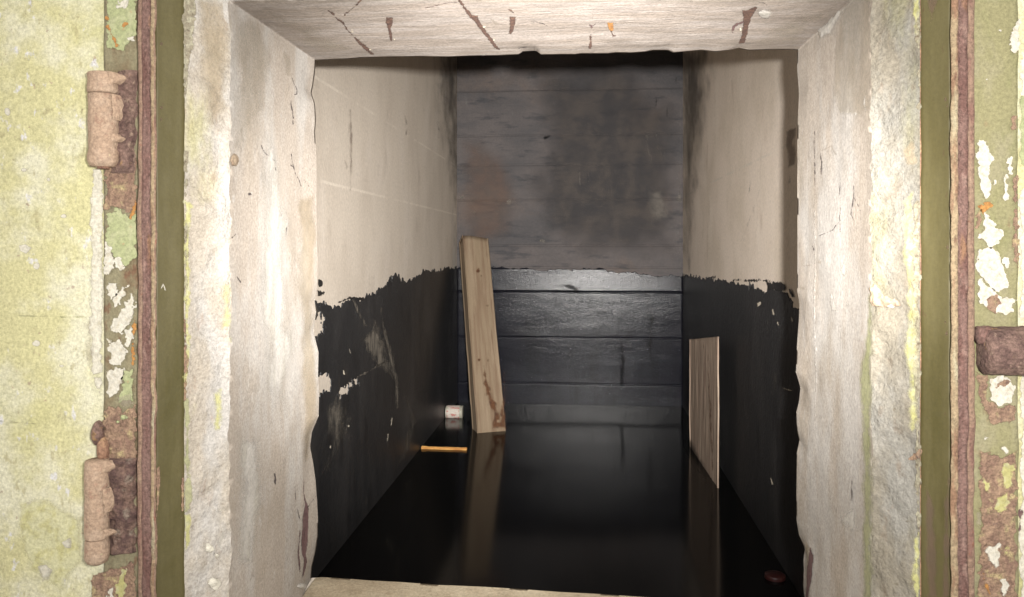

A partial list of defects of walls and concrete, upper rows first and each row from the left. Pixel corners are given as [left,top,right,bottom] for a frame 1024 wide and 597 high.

crack [328,10,374,54]
crack [426,0,524,50]
peeling [999,19,1021,53]
corrosion [108,71,126,121]
corrosion [103,158,138,219]
peeling [975,71,1024,318]
peeling [89,169,137,403]
peeling [989,375,1024,597]
corrosion [977,437,1019,597]